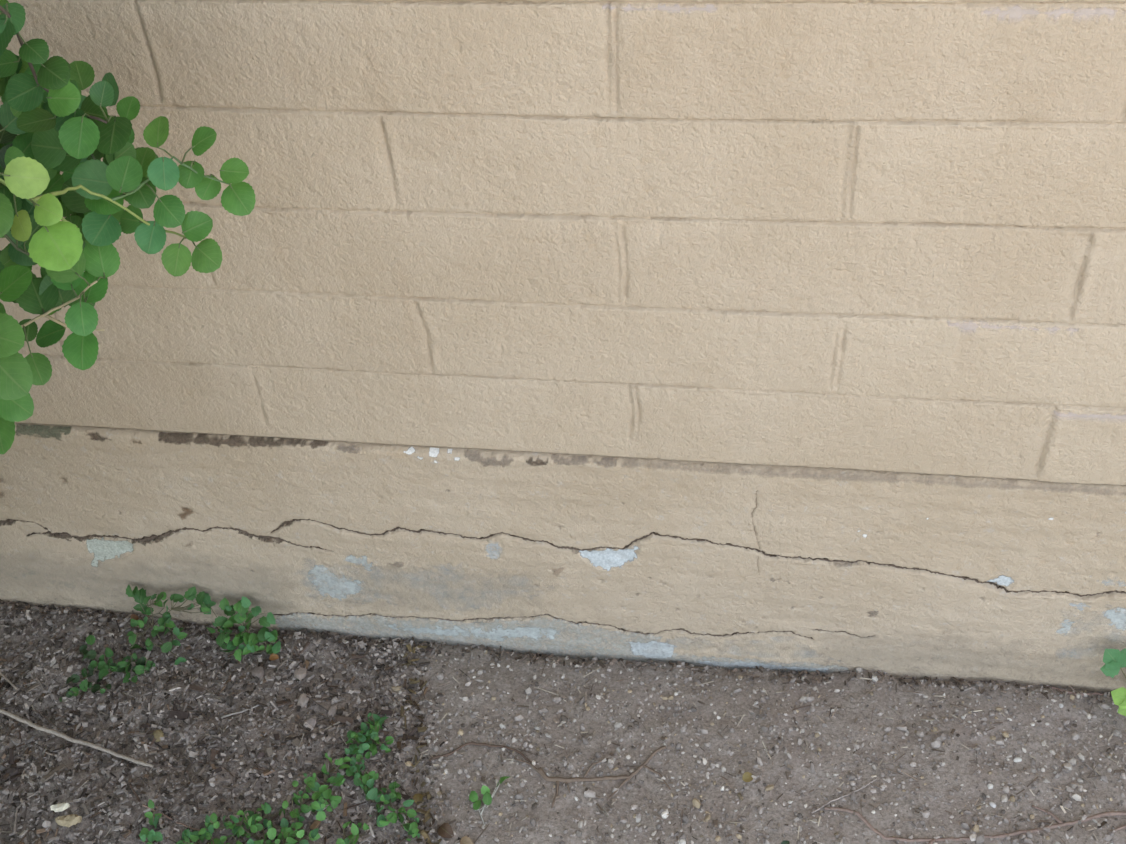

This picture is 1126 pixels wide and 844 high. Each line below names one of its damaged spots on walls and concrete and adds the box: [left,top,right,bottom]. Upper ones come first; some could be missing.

peeling [404,446,460,463]
spalling [87,538,134,567]
crack [0,491,1126,597]
spalling [579,546,638,571]
crack [273,612,871,639]